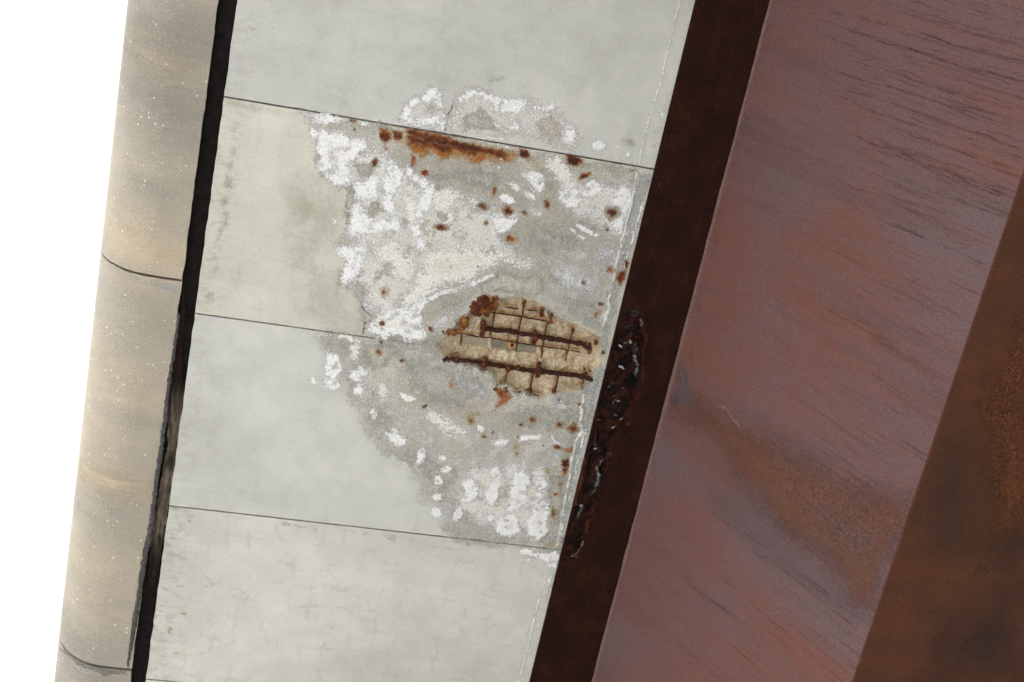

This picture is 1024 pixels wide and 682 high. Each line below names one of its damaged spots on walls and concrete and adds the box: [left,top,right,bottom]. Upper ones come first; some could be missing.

water stain [300,111,347,126]
corrosion [372,128,530,177]
corrosion [566,154,591,181]
corrosion [476,186,528,226]
corrosion [543,181,553,210]
corrosion [604,206,621,232]
corrosion [606,259,629,285]
peeling [299,85,649,553]
water stain [302,330,360,393]
water stain [414,171,650,601]
water stain [383,426,409,447]
corrosion [570,453,599,533]